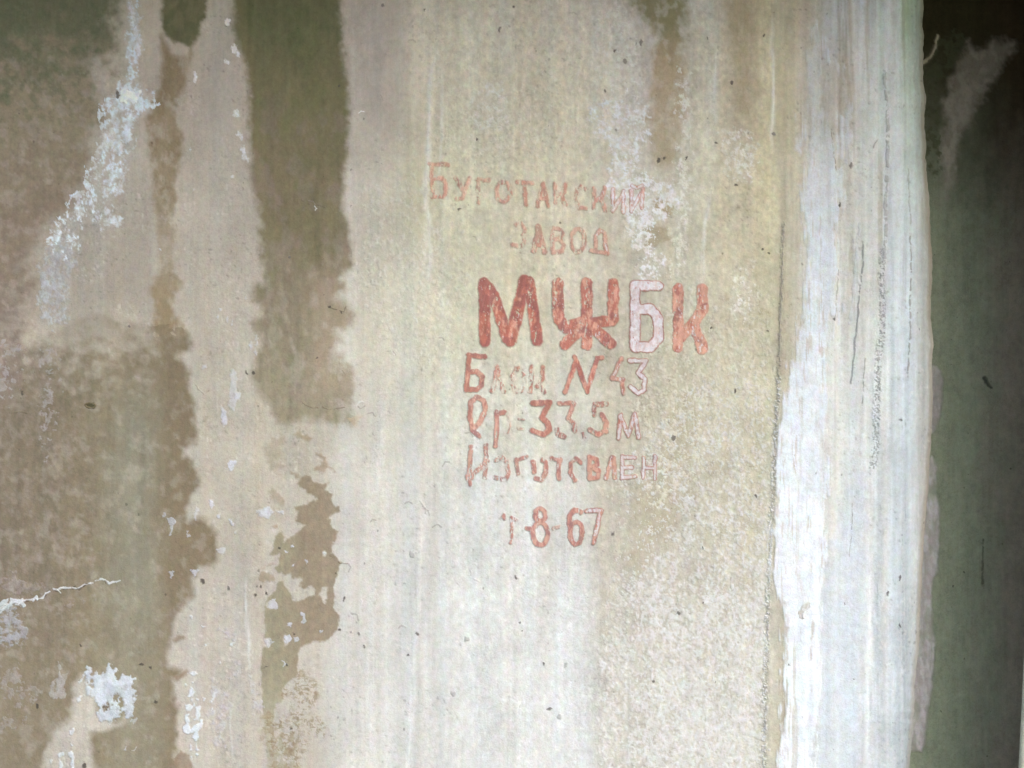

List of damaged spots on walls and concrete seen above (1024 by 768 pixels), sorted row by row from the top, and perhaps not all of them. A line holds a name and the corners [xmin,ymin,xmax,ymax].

water stain [935,32,1023,211]
water stain [0,0,224,768]
water stain [205,0,941,768]
crack [0,570,121,658]
peeling [49,727,76,768]
peeling [49,661,138,725]